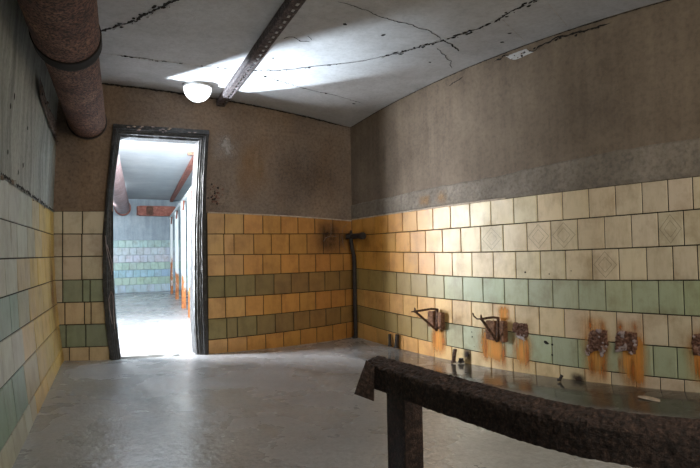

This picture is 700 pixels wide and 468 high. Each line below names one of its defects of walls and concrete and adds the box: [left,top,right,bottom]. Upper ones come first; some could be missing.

crack [101,0,179,32]
crack [209,0,670,128]
peeling [506,49,532,60]
crack [102,83,185,95]
corrosion [481,332,505,362]
corrosion [619,324,644,384]